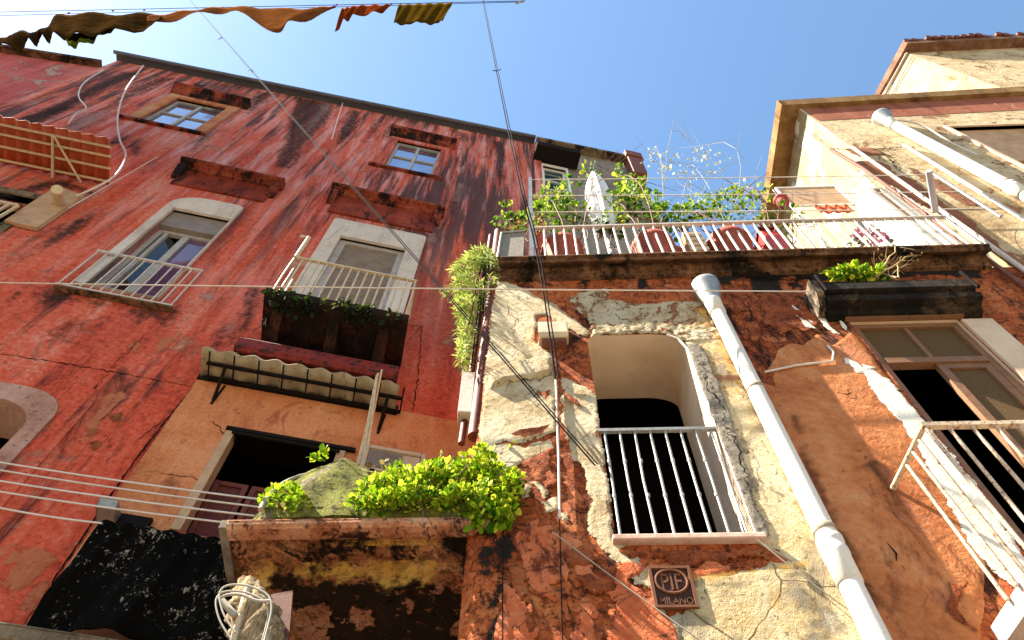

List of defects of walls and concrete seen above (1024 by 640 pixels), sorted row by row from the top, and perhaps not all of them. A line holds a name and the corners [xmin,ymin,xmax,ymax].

water stain [20,72,176,128]
water stain [277,97,332,167]
water stain [338,110,359,144]
water stain [1,180,93,197]
water stain [45,215,91,247]
crack [406,325,423,411]
crack [5,334,212,625]
peeling [478,281,863,640]
peeling [845,358,1024,588]
water stain [270,573,462,640]
flaking render [946,580,978,632]